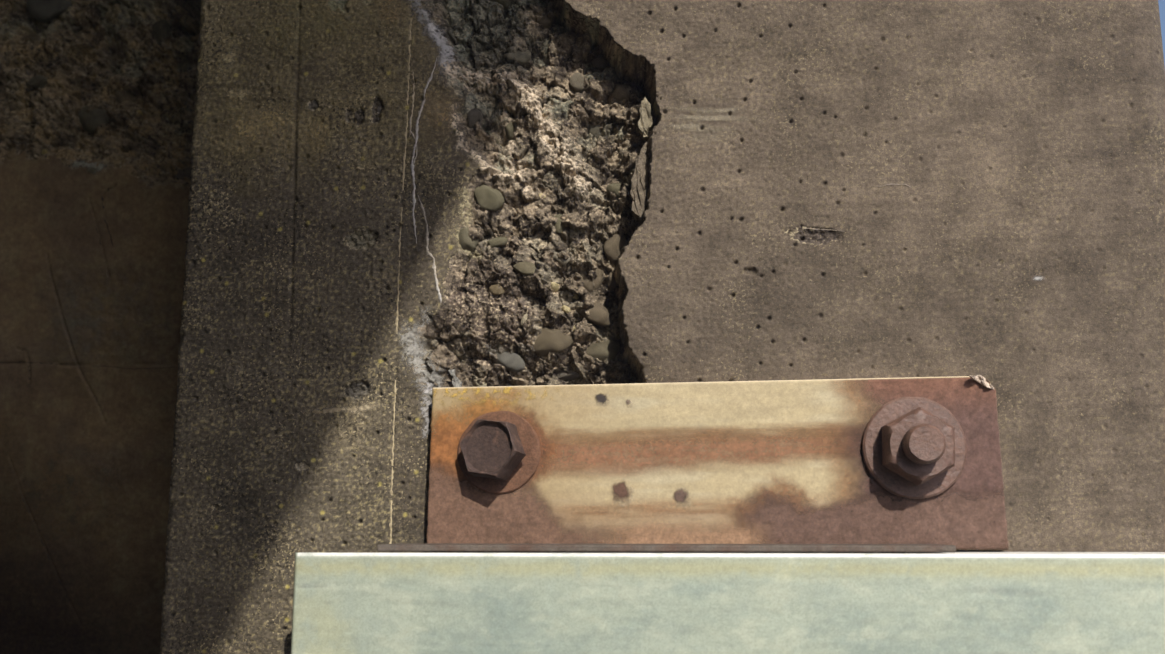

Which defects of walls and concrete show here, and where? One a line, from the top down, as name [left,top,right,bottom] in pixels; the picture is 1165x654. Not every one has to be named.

crack [395,1,442,334]
spalling [405,0,661,417]
crack [388,380,396,544]
corrosion [426,377,1008,550]